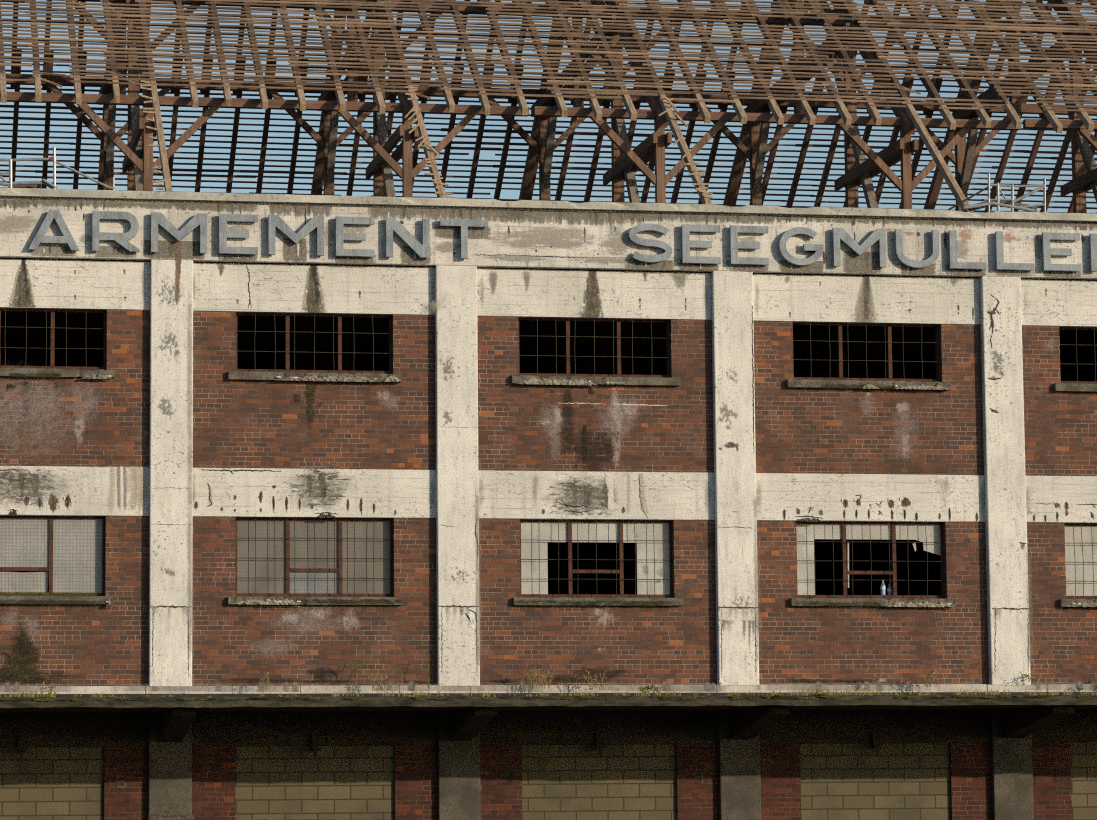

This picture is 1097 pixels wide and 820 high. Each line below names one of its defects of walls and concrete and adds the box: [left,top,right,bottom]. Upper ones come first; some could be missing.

water stain [10,245,73,307]
water stain [283,238,325,313]
water stain [581,270,604,318]
crack [987,294,1000,347]
water stain [0,469,54,504]
water stain [291,464,342,510]
water stain [550,426,615,519]
water stain [0,623,62,692]